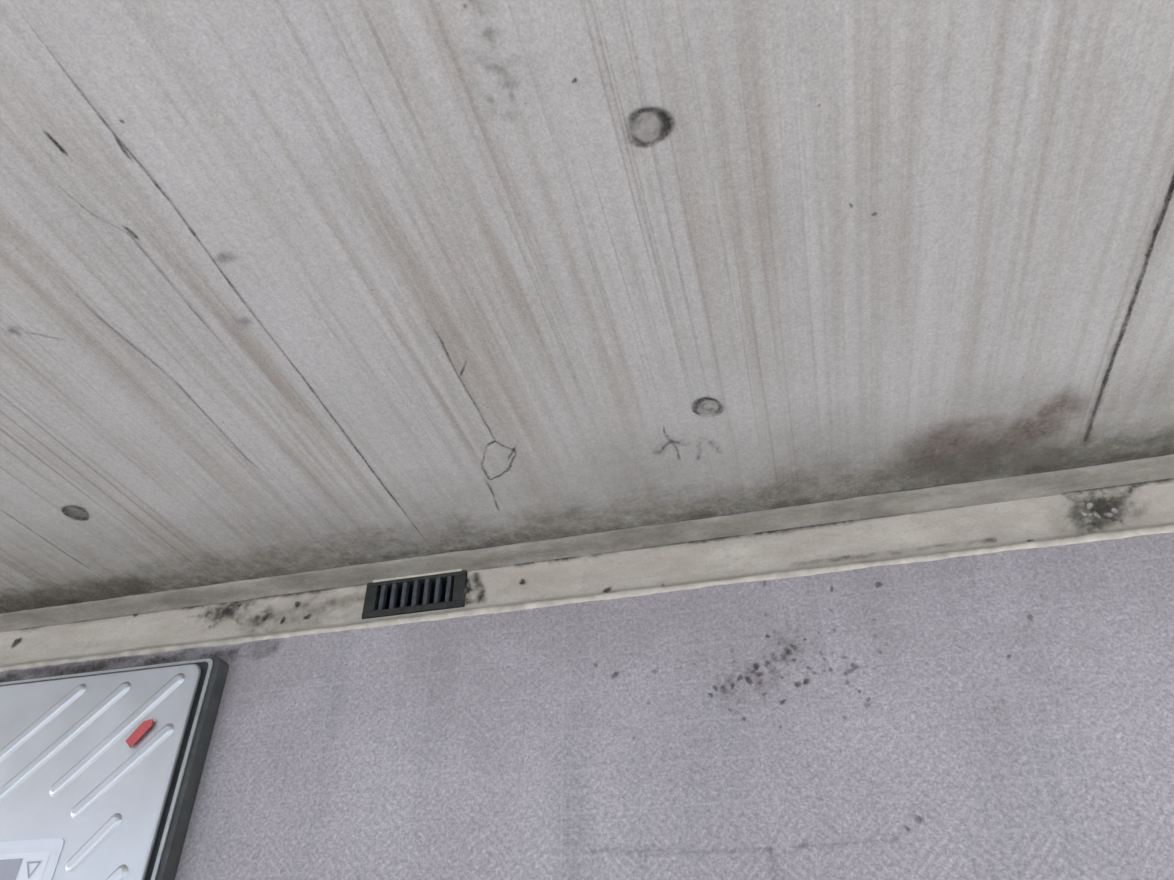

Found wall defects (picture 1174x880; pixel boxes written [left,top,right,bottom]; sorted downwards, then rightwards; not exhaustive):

crack [1083,176,1174,442]